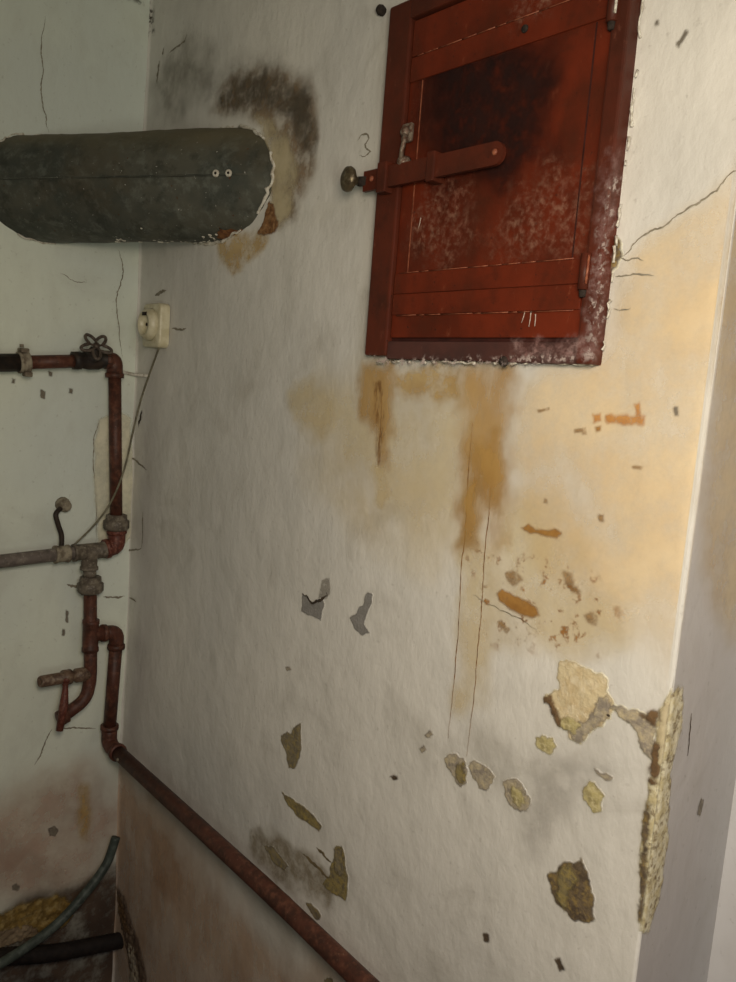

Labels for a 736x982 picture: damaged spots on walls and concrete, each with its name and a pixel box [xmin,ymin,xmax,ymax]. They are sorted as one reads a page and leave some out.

crack [39,23,47,126]
water stain [256,151,275,215]
crack [615,171,735,277]
water stain [360,369,510,541]
peeling [523,368,704,603]
peeling [301,579,330,621]
peeling [350,592,373,636]
spalling [281,723,302,769]
spalling [444,752,532,813]
spalling [544,658,683,933]
water stain [0,787,268,982]
spalling [303,844,349,901]